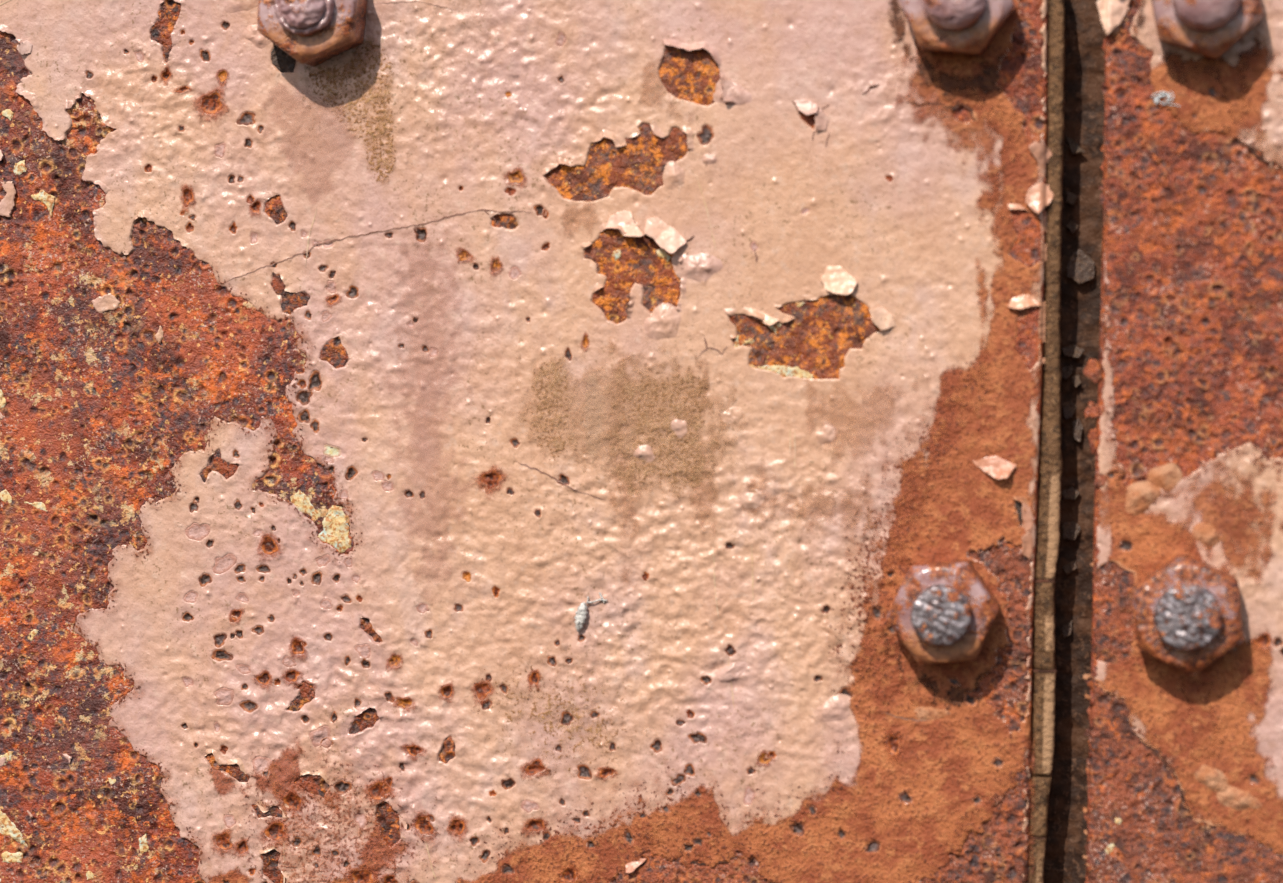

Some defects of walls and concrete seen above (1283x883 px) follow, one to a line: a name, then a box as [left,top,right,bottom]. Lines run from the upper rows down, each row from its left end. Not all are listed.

peeling [124,0,264,148]
peeling [505,121,714,201]
rust [1134,0,1145,32]
rust [1150,38,1283,168]
crack [228,209,531,281]
peeling [580,211,687,324]
peeling [724,266,897,381]
peeling [1062,0,1283,486]
peeling [0,23,491,883]
rust [457,0,1043,883]
rust [1096,269,1283,587]
rust [1100,611,1283,855]